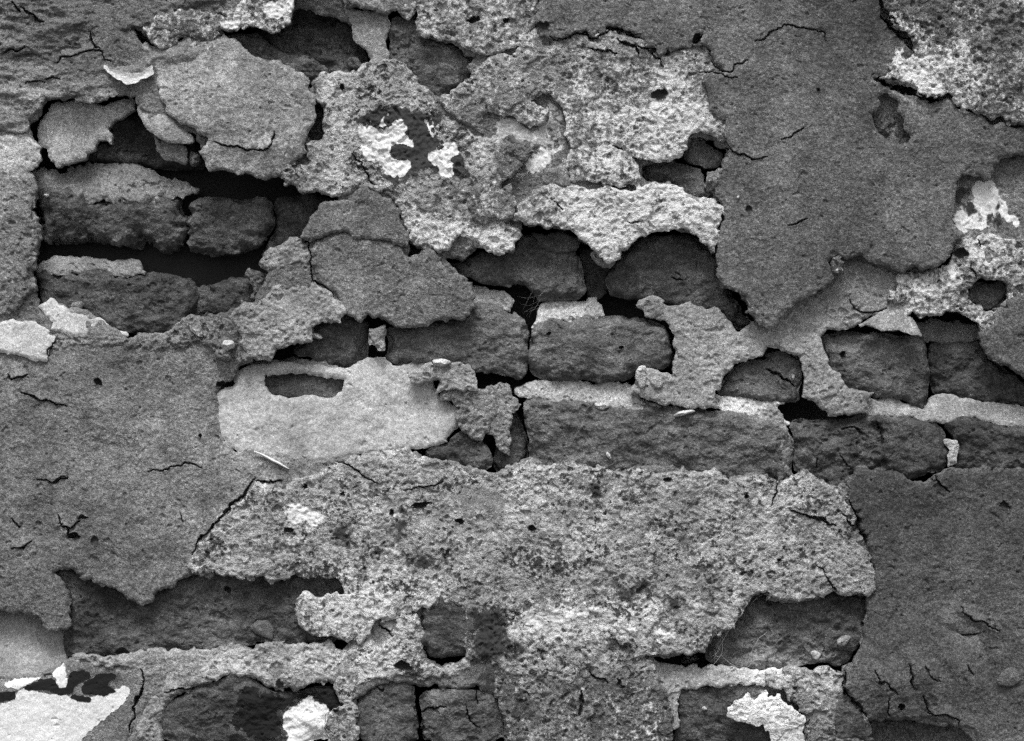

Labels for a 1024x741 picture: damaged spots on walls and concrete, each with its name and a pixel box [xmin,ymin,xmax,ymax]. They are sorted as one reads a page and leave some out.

crack [705,24,826,78]
spalling [0,0,1024,486]
crack [7,374,66,406]
crack [58,515,87,538]
crack [180,479,281,555]
spalling [0,569,391,679]
spalling [421,597,478,658]
spalling [161,675,343,741]
spalling [356,660,504,741]
spalling [645,591,866,741]